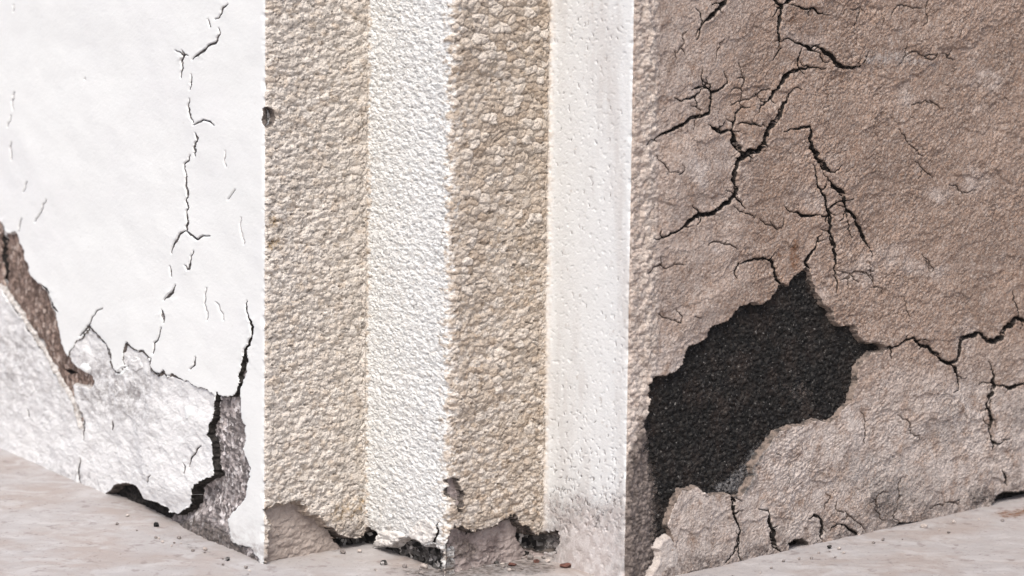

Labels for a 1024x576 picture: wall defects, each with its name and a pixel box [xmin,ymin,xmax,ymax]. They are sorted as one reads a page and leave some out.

crack [153,4,228,354]
peeling [0,222,635,576]
crack [725,497,781,563]
spalling [640,267,886,567]
crack [646,0,1024,485]
crack [809,479,901,540]